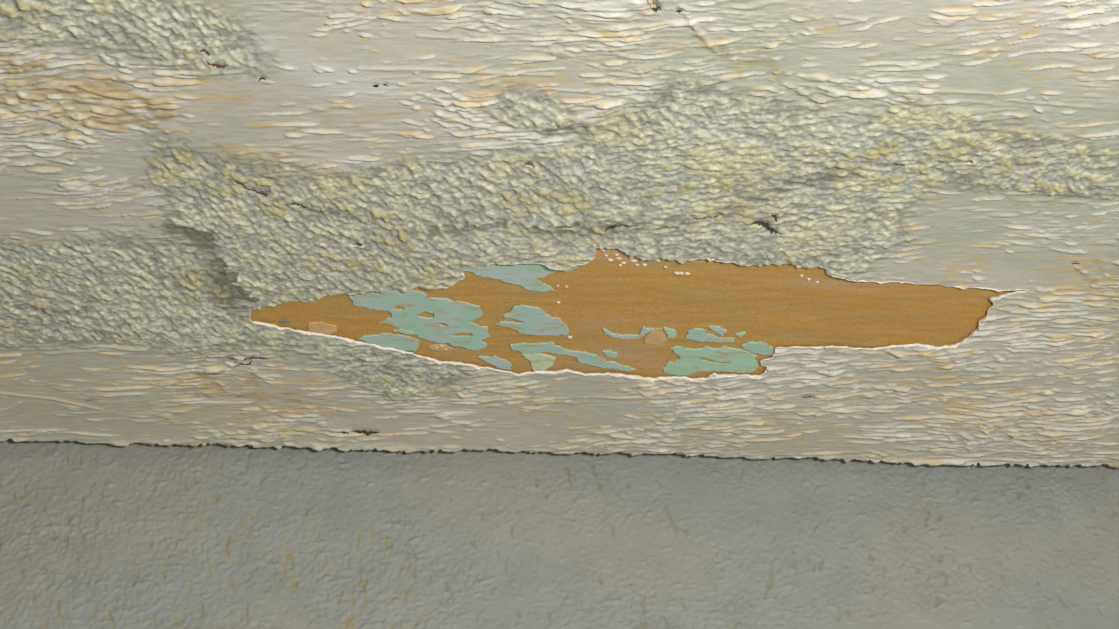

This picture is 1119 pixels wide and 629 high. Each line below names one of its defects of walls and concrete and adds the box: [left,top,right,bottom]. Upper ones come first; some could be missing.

peeling [249,248,1030,382]